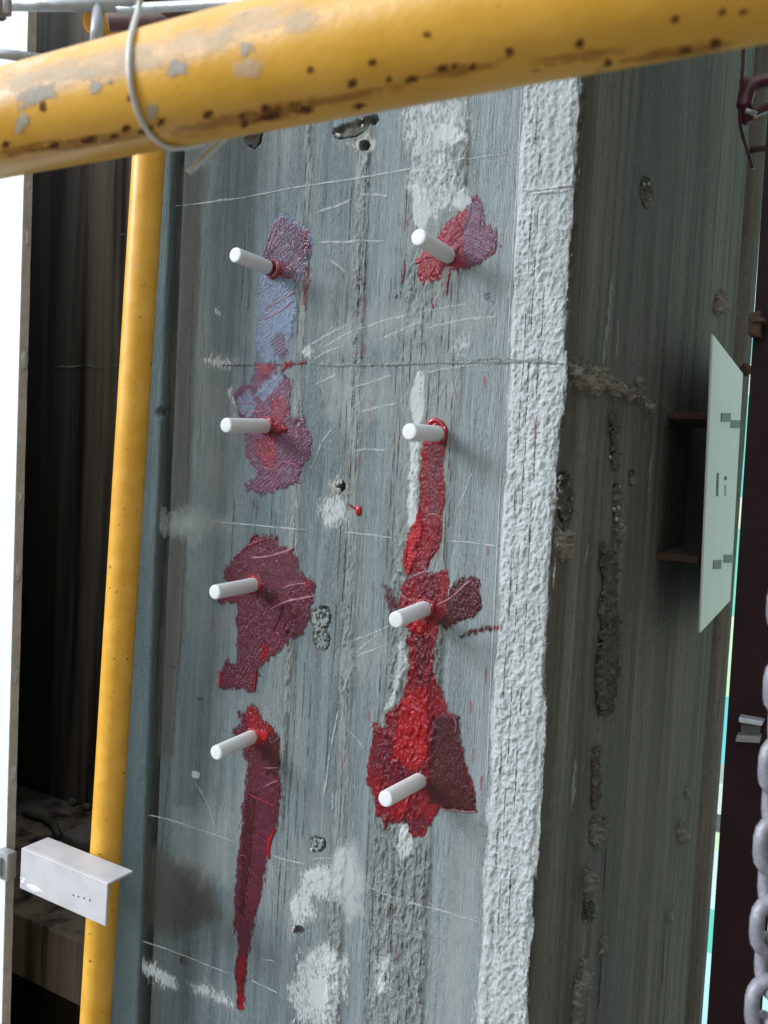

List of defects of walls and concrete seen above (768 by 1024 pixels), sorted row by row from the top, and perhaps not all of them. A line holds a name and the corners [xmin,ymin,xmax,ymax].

spalling [550,470,579,562]
spalling [312,608,331,650]
spalling [595,471,637,717]
damp [287,847,361,939]
damp [287,942,350,1024]
spalling [571,957,596,1024]